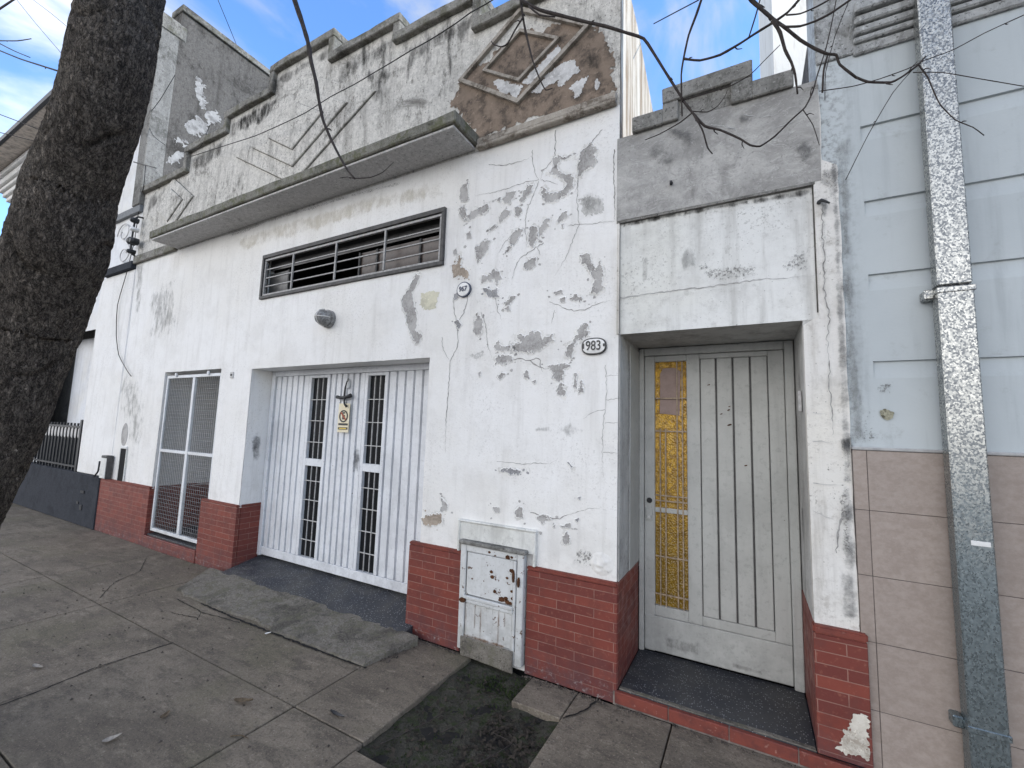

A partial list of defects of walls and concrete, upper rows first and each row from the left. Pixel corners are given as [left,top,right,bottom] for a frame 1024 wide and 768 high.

peeling [166,76,222,165]
peeling [450,23,617,138]
peeling [450,141,607,312]
crack [489,130,615,270]
peeling [400,270,440,347]
crack [442,291,544,448]
peeling [452,311,591,400]
crack [583,365,618,462]
peeling [421,493,453,529]
leakage [840,495,852,554]
corrosion [490,555,513,605]
spalling [835,714,871,761]